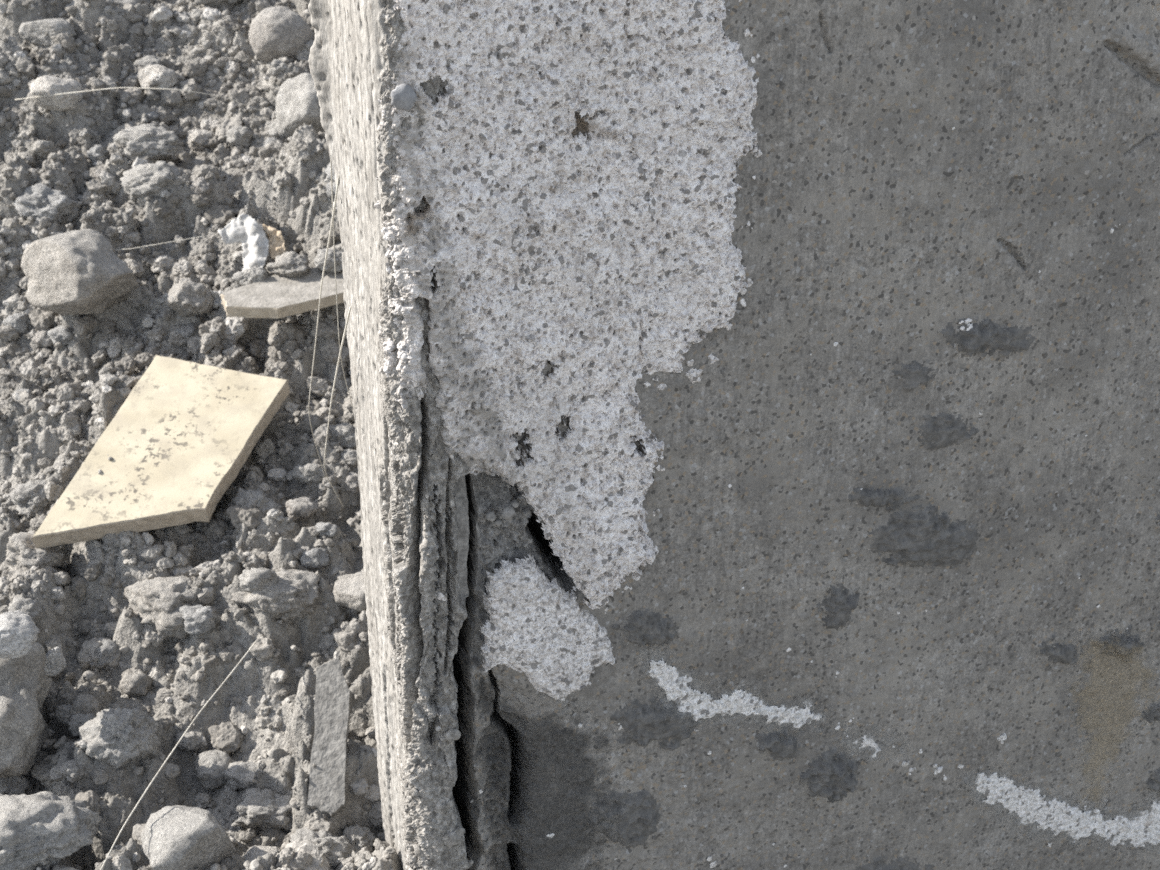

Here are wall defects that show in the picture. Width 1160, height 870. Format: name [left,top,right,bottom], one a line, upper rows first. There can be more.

crack [452,474,501,860]
spalling [374,0,762,870]